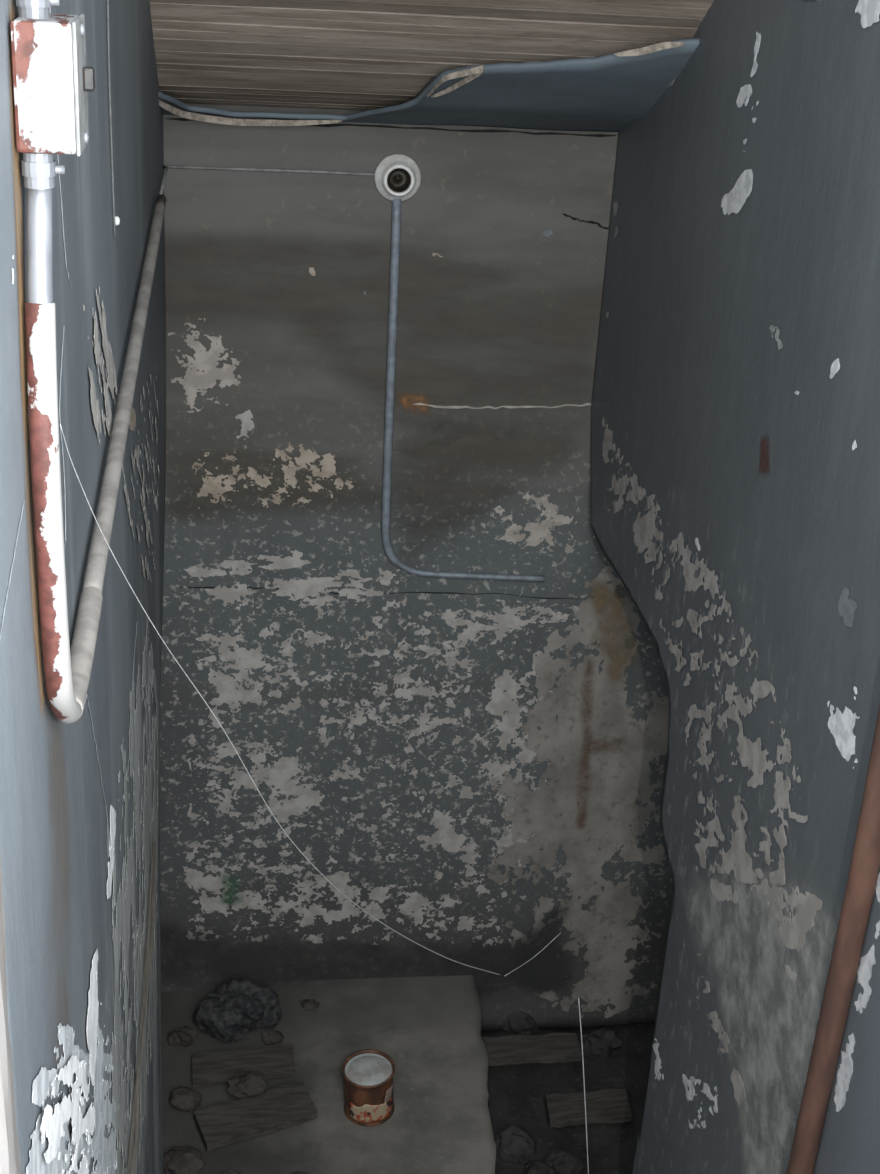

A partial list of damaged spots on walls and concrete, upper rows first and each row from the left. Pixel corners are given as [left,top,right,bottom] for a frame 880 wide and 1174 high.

peeling [855,0,880,28]
flaking render [150,0,714,126]
peeling [736,32,761,123]
peeling [721,169,753,215]
peeling [168,318,241,413]
peeling [830,358,840,379]
peeling [838,587,857,627]
peeling [827,686,859,769]
flaking render [181,409,836,1174]
peeling [26,613,159,1174]